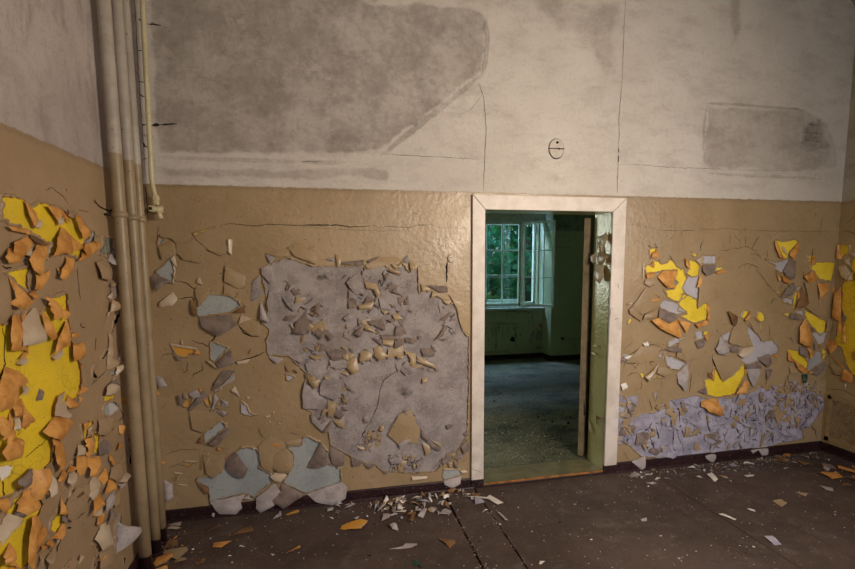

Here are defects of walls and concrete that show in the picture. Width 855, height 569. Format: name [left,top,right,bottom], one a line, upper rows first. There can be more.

crack [219,223,467,231]
crack [394,85,486,191]
peeling [0,193,142,569]
peeling [151,225,471,517]
peeling [617,238,855,470]
peeling [819,471,855,491]